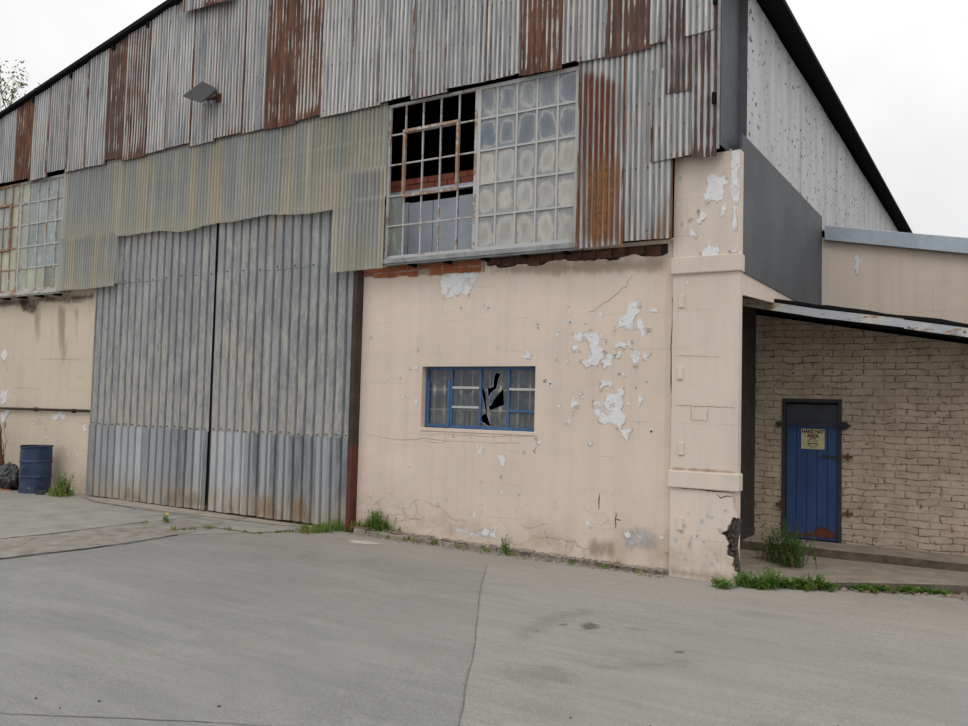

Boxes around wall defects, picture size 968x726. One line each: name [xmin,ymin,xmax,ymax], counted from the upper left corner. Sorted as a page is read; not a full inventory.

corrosion [583,72,618,243]
peeling [681,148,740,256]
flaking render [364,243,668,317]
peeling [555,298,658,440]
peeling [0,389,17,424]
crack [501,497,619,556]
spalling [624,509,742,573]